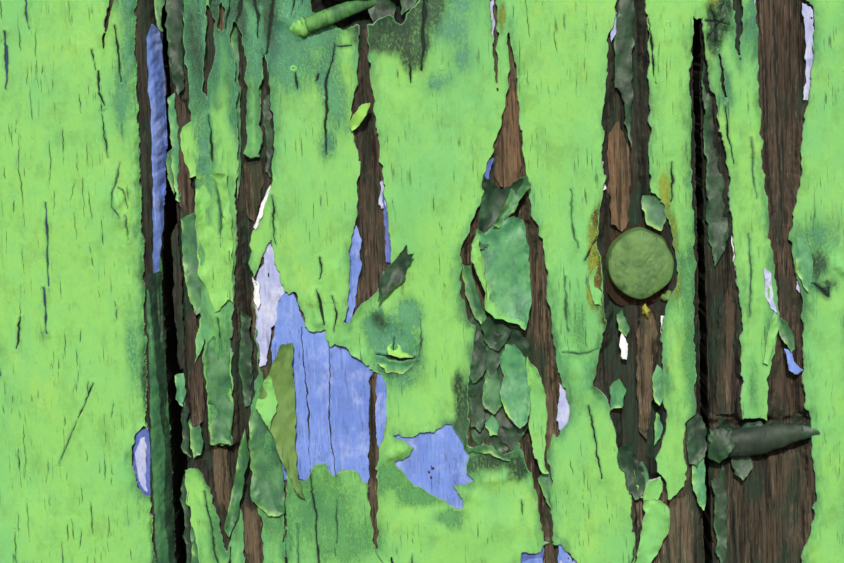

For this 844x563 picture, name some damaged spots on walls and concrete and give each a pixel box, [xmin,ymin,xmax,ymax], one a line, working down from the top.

crack [0,0,43,116]
crack [4,129,25,226]
crack [14,301,22,349]
crack [43,25,128,563]
peeling [143,0,419,563]
peeling [394,0,577,563]
peeling [588,0,817,563]
crack [811,283,830,297]
crack [3,397,26,477]